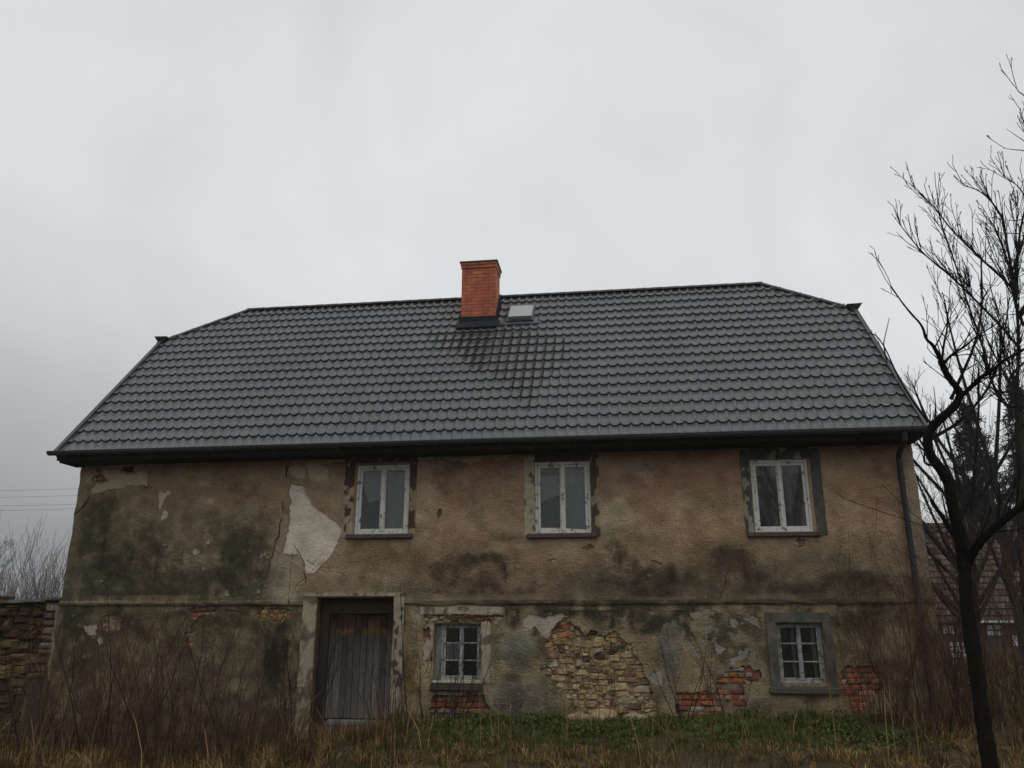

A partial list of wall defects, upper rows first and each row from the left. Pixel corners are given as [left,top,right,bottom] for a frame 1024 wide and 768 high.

flaking render [90,466,148,494]
crack [267,501,315,582]
flaking render [249,459,344,594]
spalling [429,692,490,717]
flaking render [522,612,663,717]
spalling [675,608,765,717]